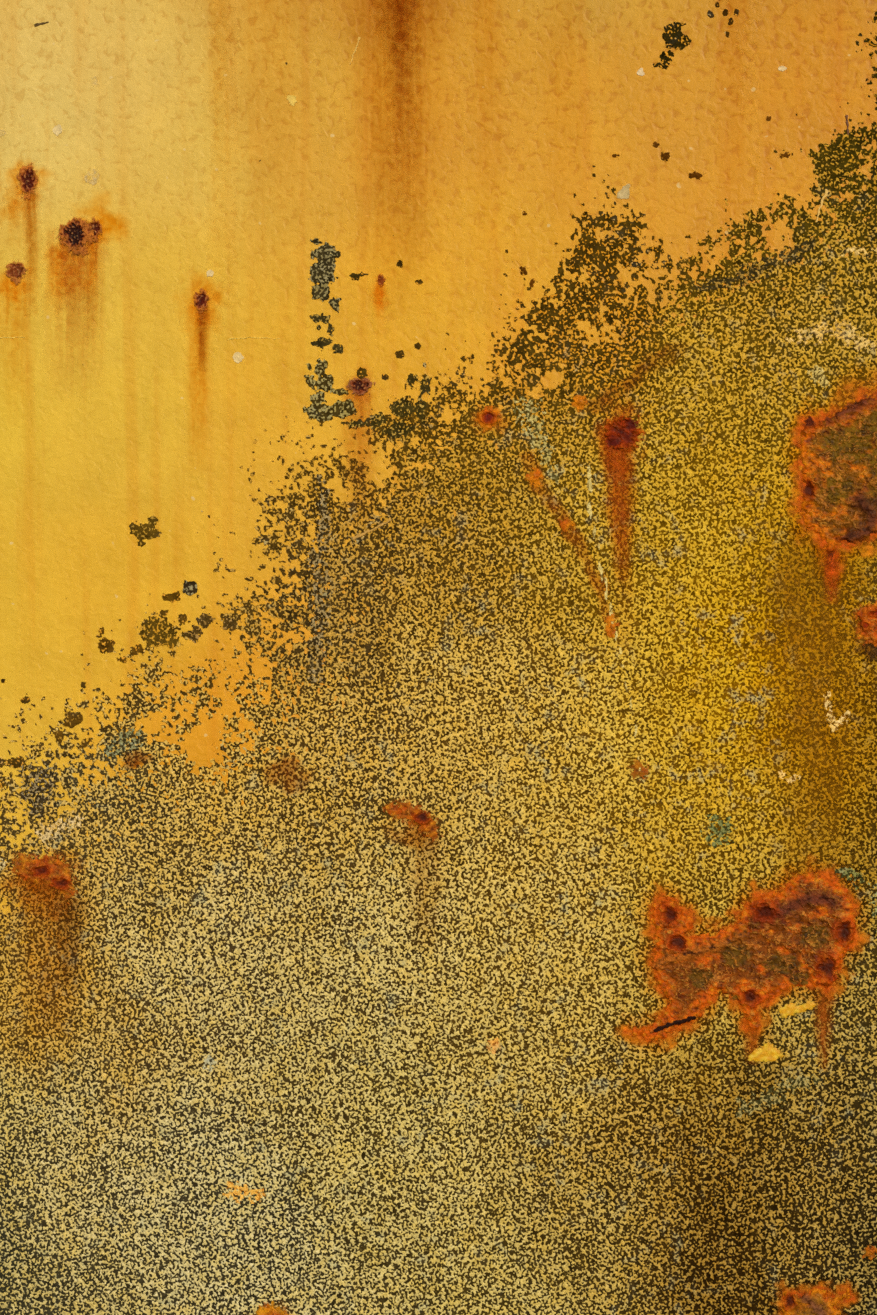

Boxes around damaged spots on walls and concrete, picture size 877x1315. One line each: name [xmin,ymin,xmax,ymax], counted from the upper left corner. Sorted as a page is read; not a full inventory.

rust [16,162,38,199]
rust [58,217,102,256]
rust [5,261,27,285]
rust [193,288,209,318]
rust [604,413,646,466]
rust [789,380,877,581]
rust [855,601,877,659]
rust [382,798,442,842]
rust [9,853,78,904]
rust [620,858,869,1062]
rust [256,1301,288,1315]
rust [778,1281,857,1315]